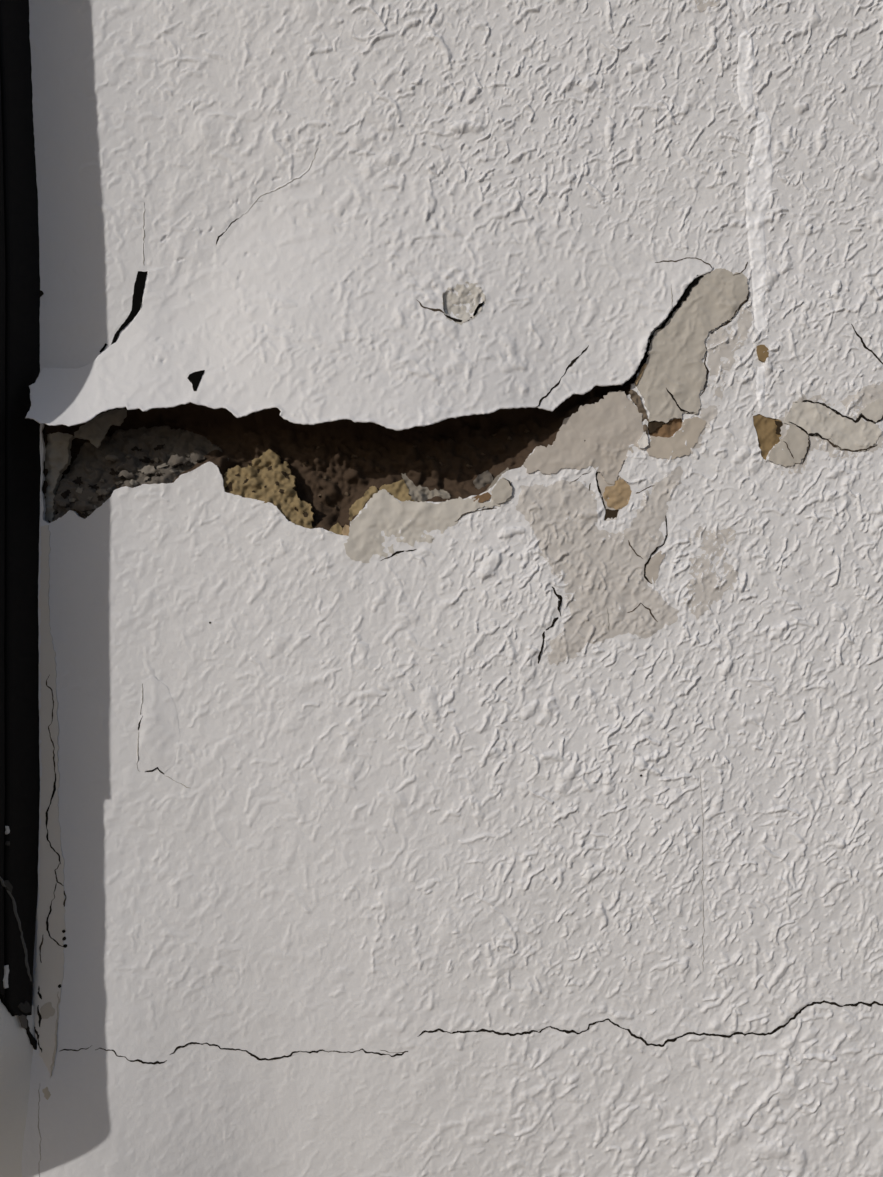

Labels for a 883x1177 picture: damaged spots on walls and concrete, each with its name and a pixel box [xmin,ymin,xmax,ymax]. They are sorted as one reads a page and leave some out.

peeling [25,157,749,563]
peeling [752,398,883,467]
crack [0,676,883,1177]